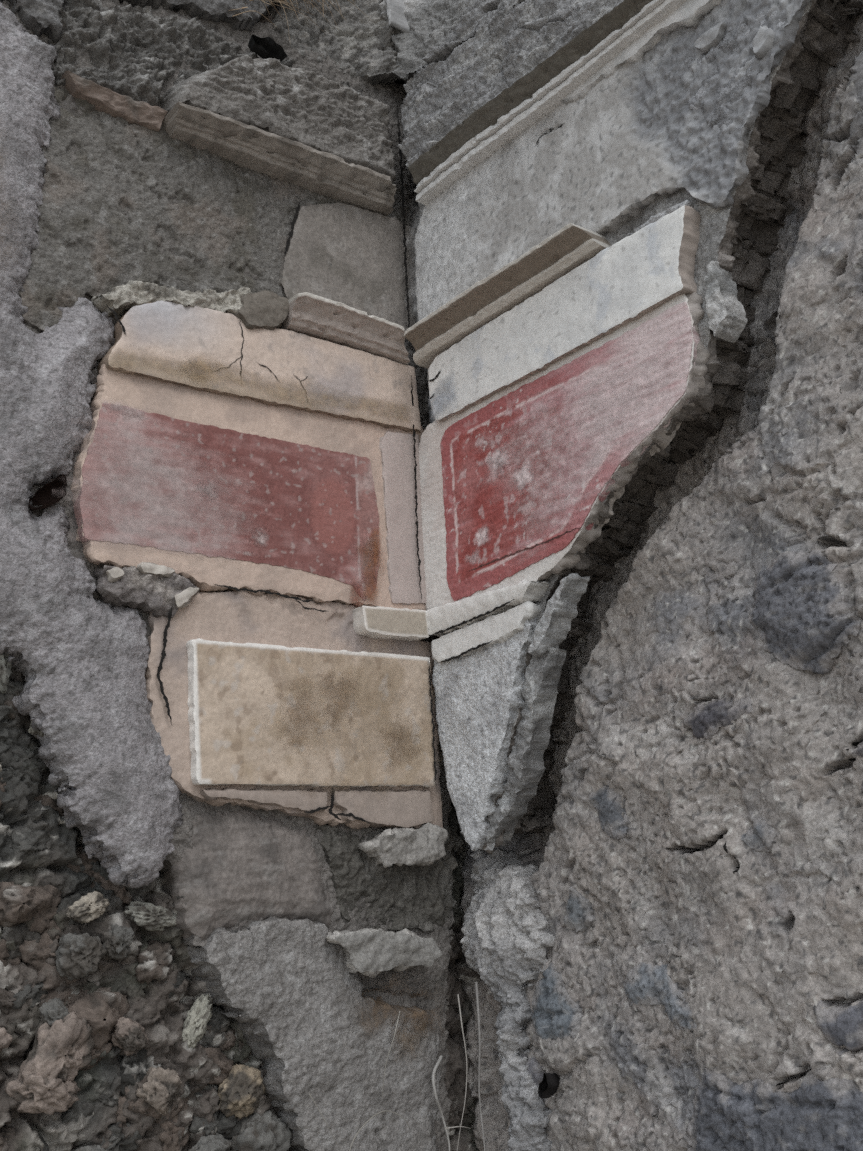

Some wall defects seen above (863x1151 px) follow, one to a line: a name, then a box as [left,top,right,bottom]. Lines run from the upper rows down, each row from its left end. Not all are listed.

crack [212,320,308,401]
crack [156,606,173,725]
crack [305,787,369,823]